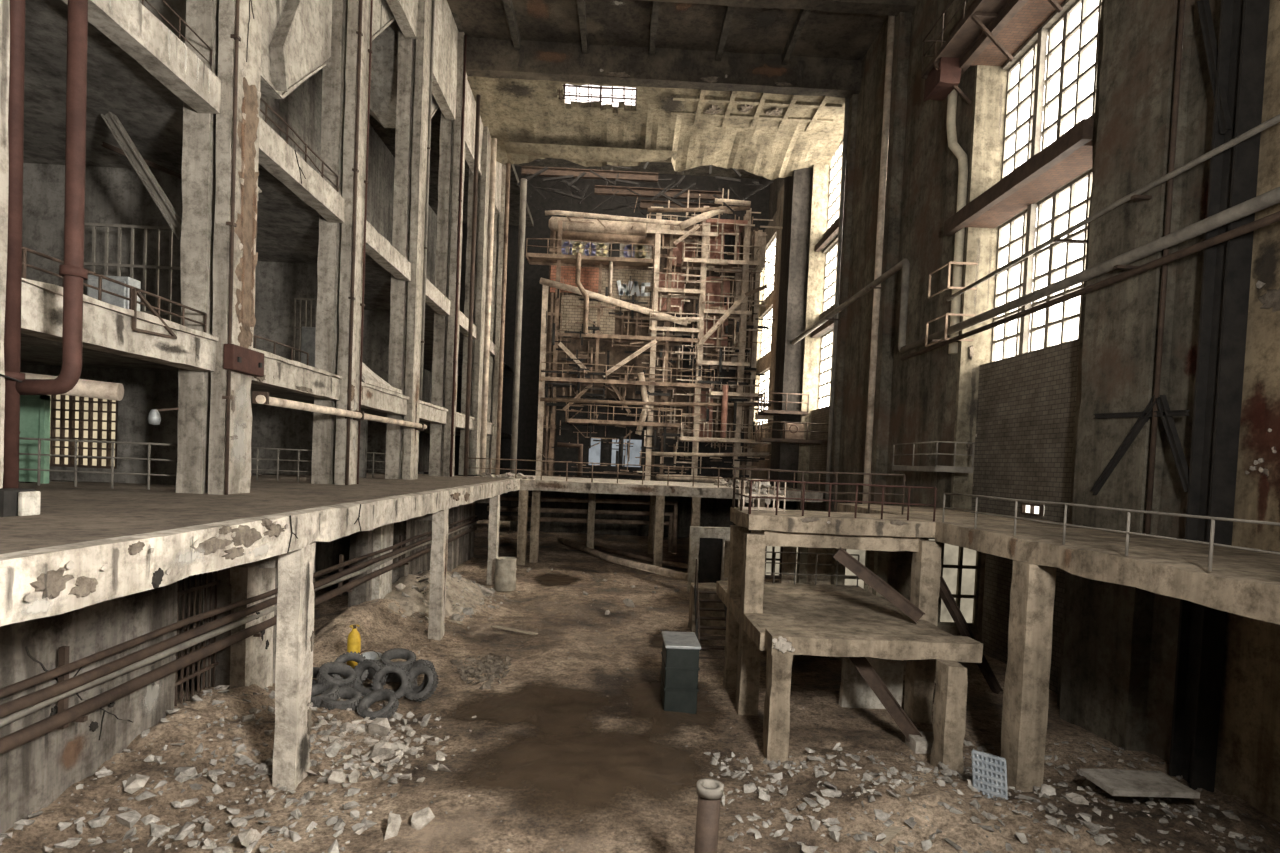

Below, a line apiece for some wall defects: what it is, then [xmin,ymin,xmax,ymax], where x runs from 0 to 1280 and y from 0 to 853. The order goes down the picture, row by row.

rust [241,99,257,319]
spalling [190,518,288,560]
spalling [24,561,108,602]